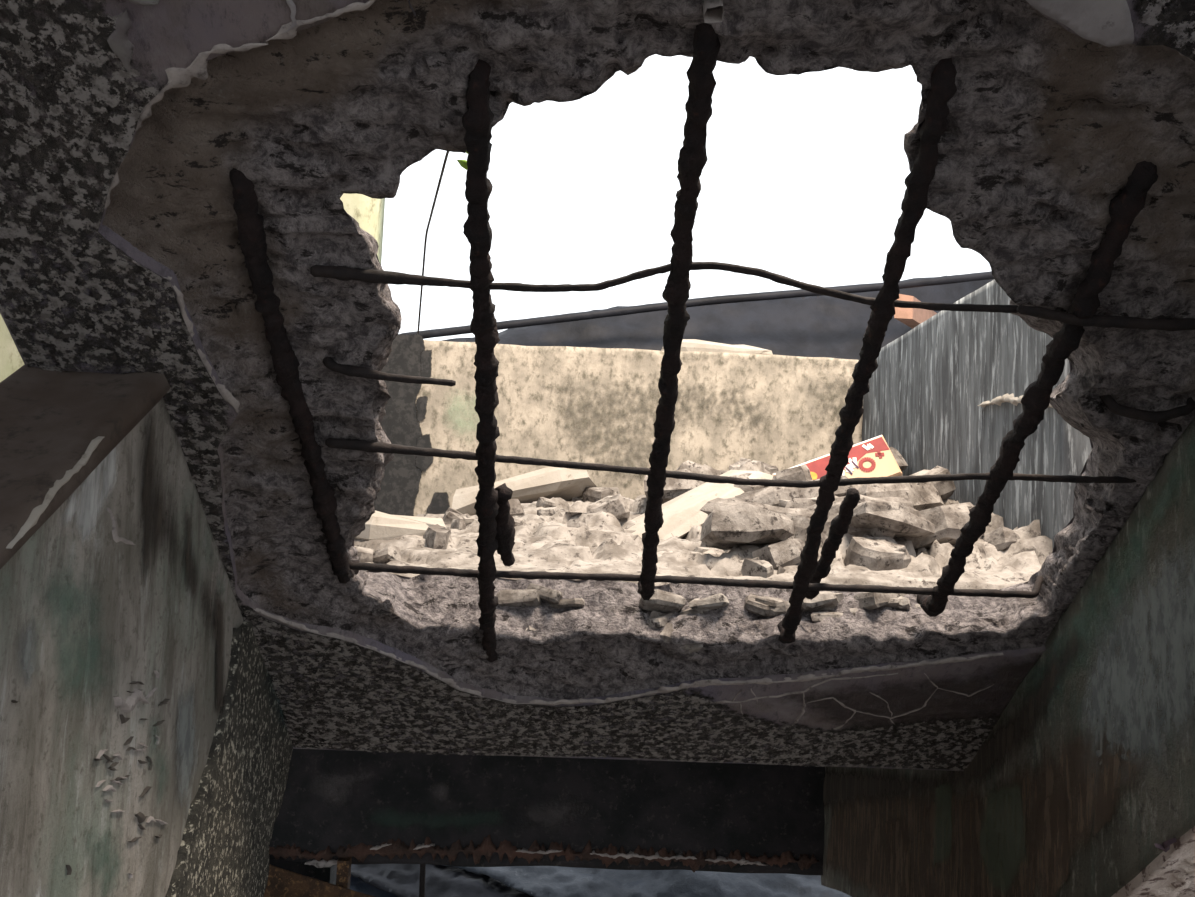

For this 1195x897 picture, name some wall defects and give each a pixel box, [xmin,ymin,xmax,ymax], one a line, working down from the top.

spalling [96,0,1195,705]